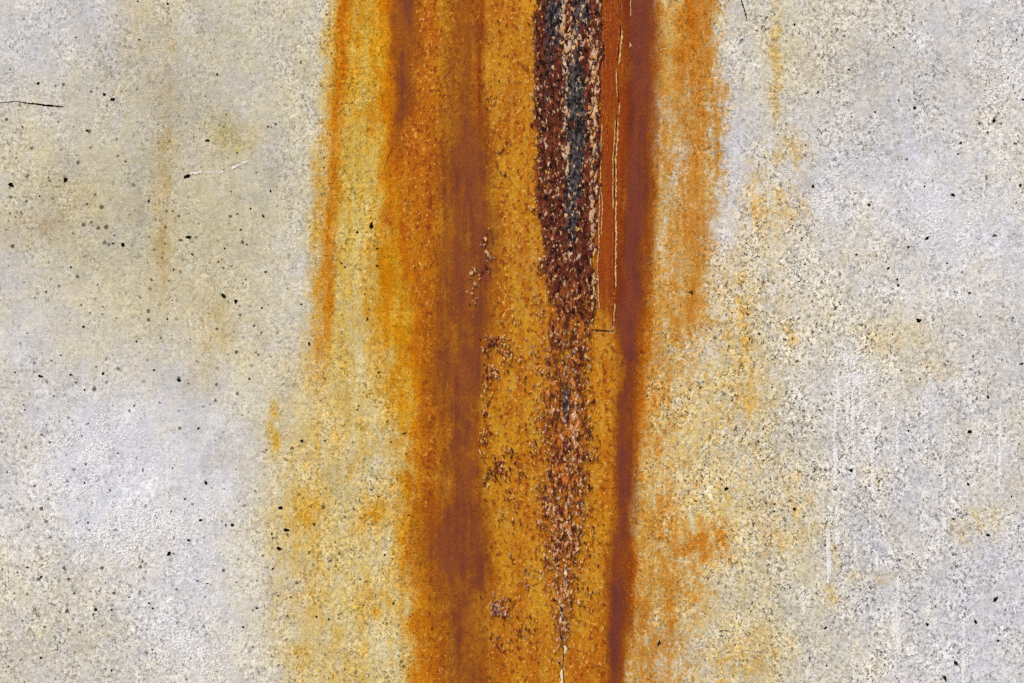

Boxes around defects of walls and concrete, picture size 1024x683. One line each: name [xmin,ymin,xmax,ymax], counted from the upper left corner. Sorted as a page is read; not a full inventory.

crack [0,100,64,108]
rust [381,0,726,683]